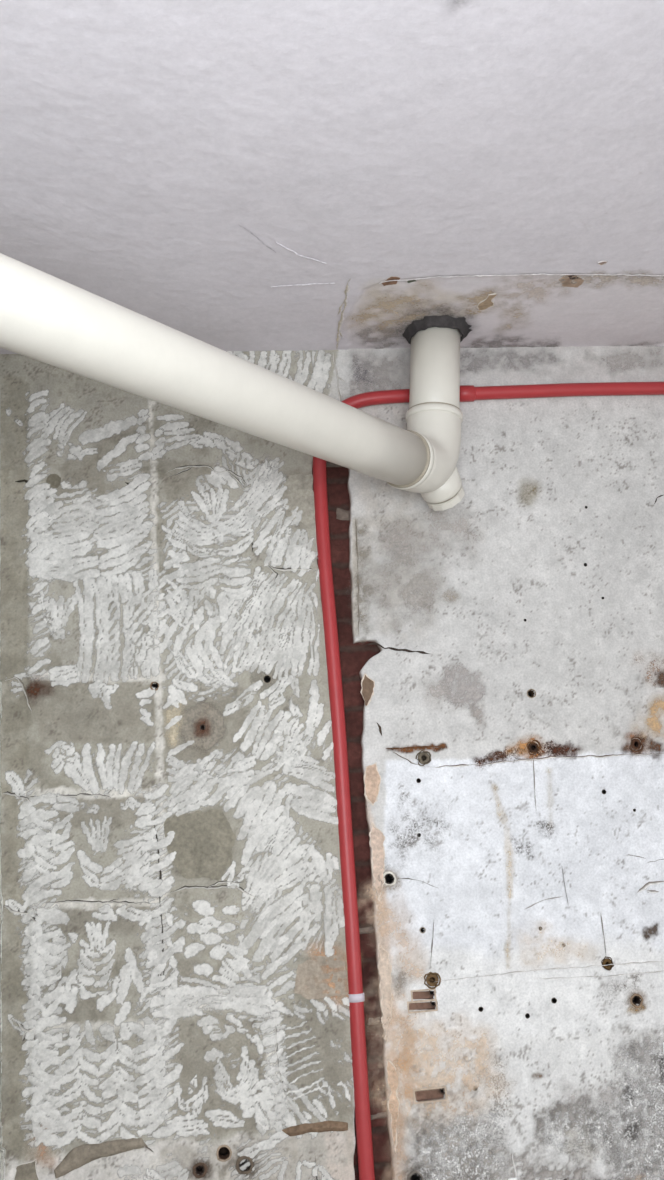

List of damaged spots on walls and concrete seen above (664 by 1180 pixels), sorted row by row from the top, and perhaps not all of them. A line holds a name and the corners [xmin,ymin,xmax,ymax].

corrosion [391,743,447,753]
corrosion [475,741,580,766]